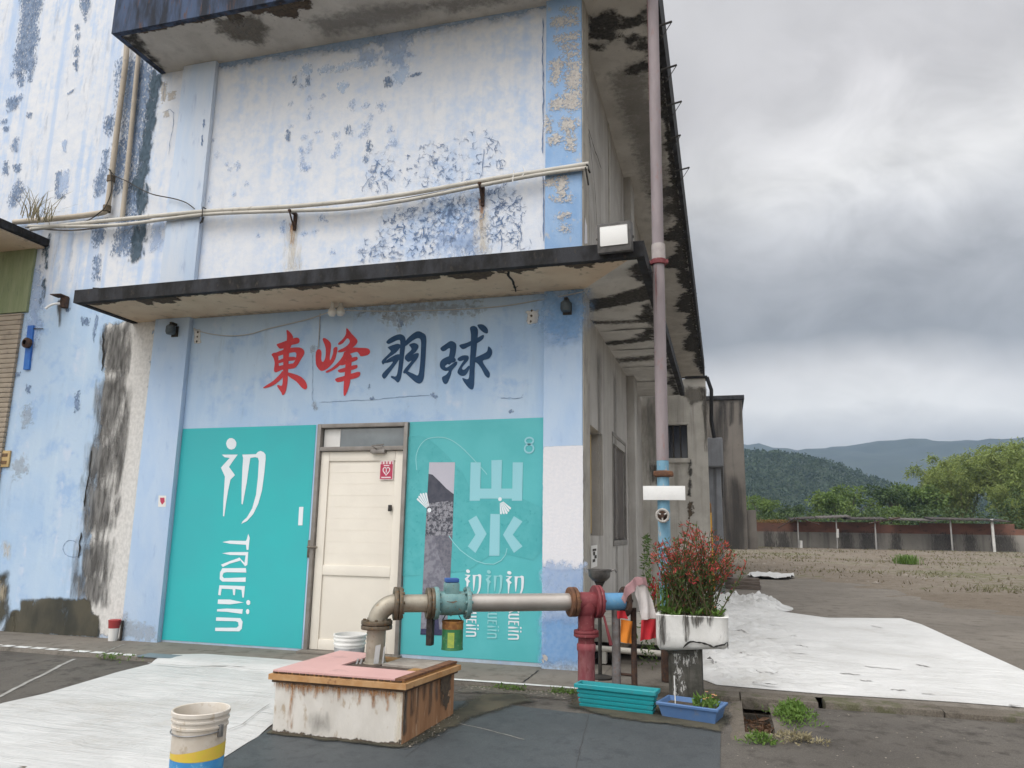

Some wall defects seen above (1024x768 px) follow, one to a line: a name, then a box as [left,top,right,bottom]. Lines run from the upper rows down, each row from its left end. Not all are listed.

peeling [1,0,43,207]
peeling [54,170,69,199]
damp [121,33,163,263]
peeling [363,140,394,184]
damp [215,6,544,68]
peeling [361,189,519,261]
crack [358,20,544,292]
peeling [543,6,584,152]
damp [588,9,703,374]
damp [544,264,654,345]
damp [0,322,131,637]
rust [274,675,452,734]